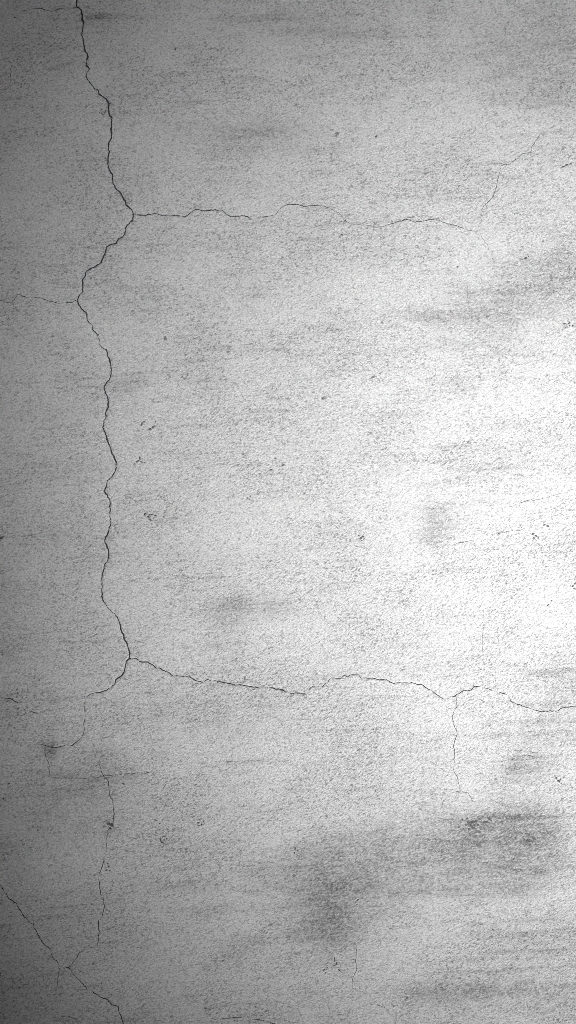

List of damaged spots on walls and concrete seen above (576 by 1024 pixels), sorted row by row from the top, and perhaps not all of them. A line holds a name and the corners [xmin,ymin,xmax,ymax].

crack [0,0,576,804]
crack [0,760,148,1024]